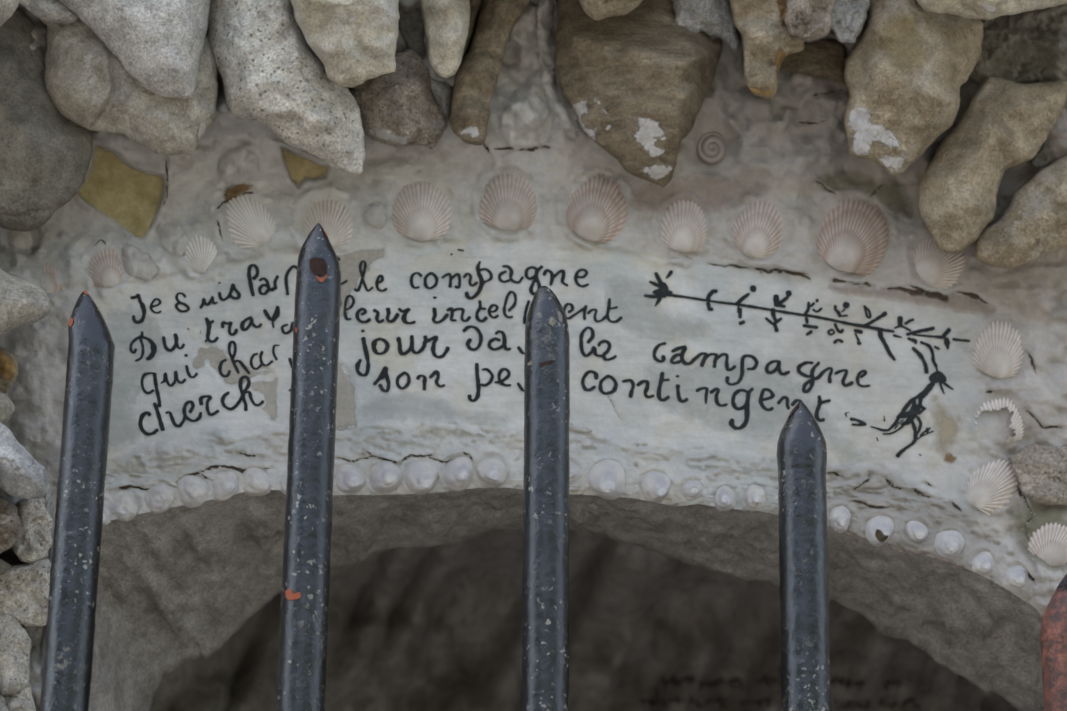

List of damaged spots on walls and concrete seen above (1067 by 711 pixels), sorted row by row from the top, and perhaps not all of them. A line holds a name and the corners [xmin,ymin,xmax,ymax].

crack [483,143,550,152]
crack [710,264,987,304]